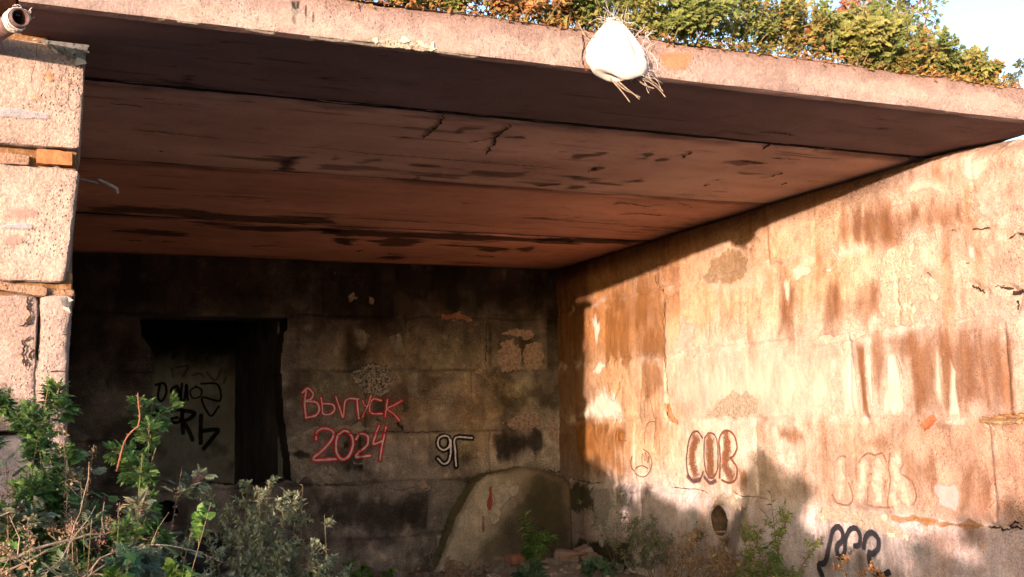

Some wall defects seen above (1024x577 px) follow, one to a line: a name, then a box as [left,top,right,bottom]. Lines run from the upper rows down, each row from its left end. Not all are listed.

crack [110,98,596,172]
spalling [497,328,544,373]